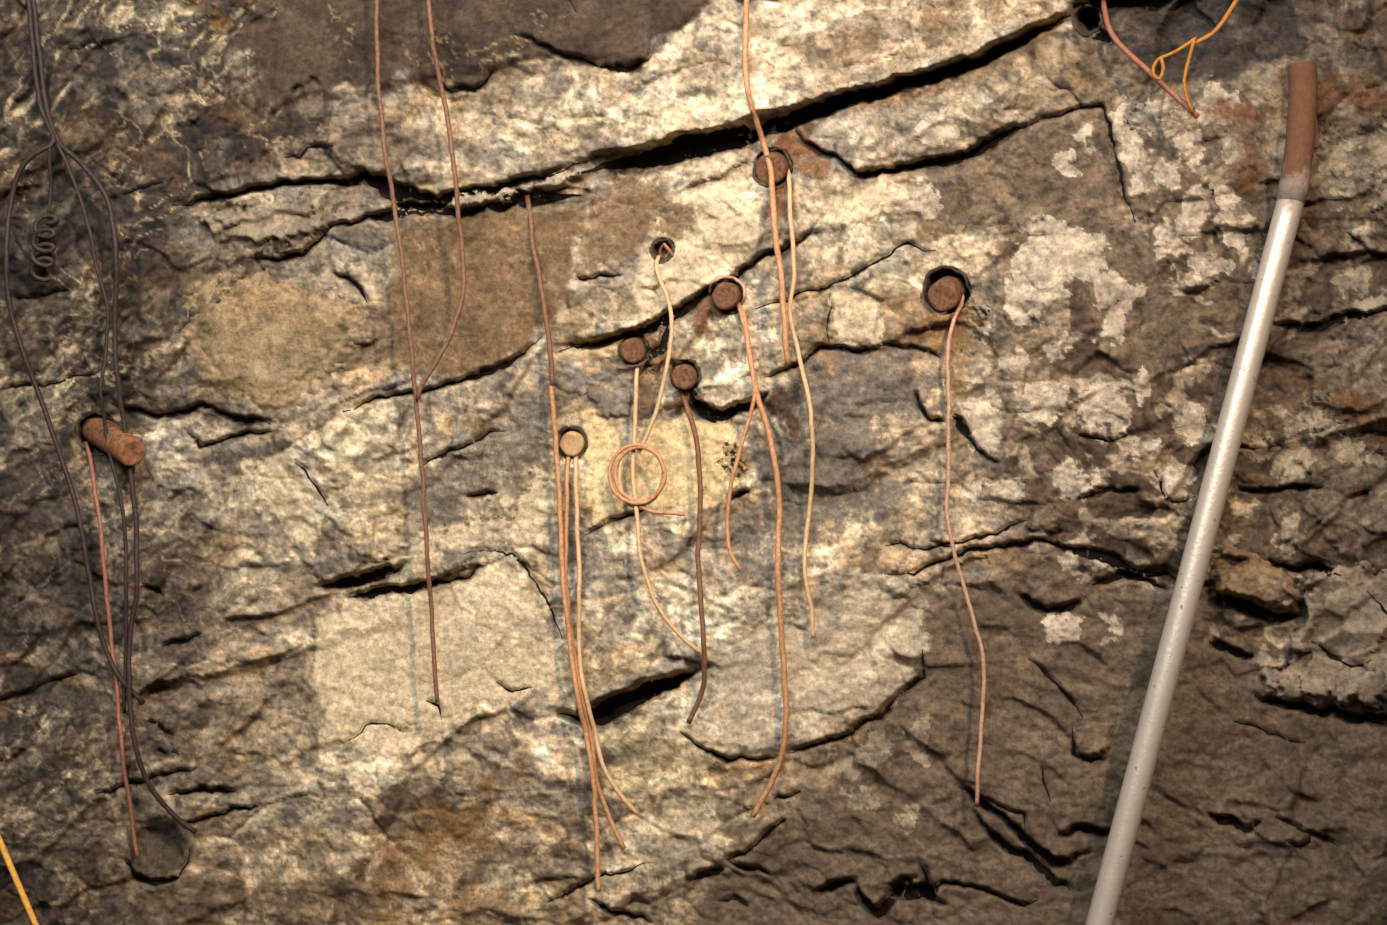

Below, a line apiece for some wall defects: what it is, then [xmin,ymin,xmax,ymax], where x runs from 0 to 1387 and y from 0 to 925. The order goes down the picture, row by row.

crack [123,0,1172,303]
rust [776,121,829,177]
rust [765,182,793,215]
rust [692,282,725,339]
rust [638,336,677,411]
crack [881,520,1177,613]
crack [1208,595,1371,668]
crack [559,668,701,726]
crack [680,648,925,762]
crack [1234,695,1387,742]
crack [816,658,1110,918]
crack [689,790,801,906]